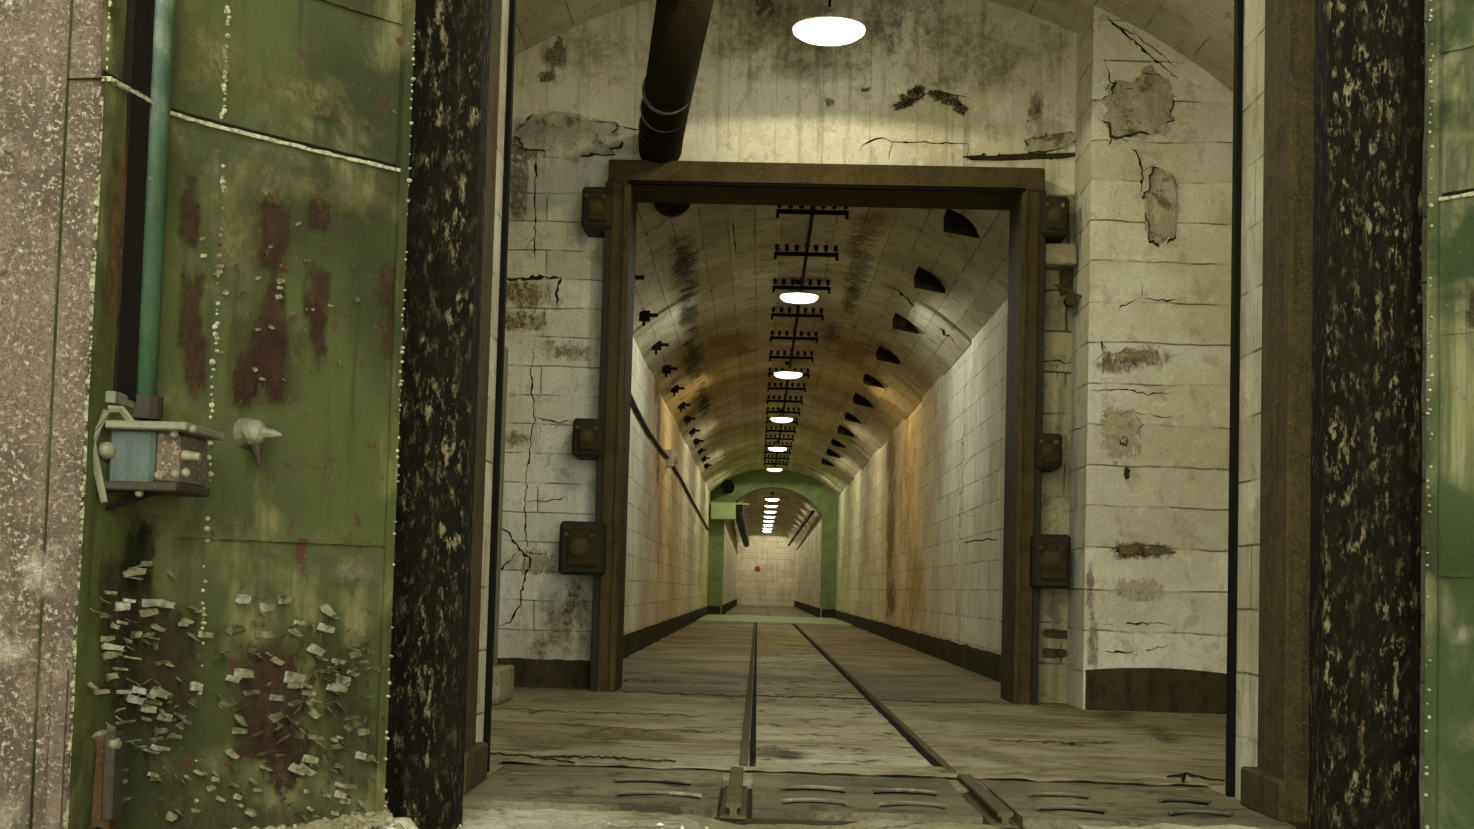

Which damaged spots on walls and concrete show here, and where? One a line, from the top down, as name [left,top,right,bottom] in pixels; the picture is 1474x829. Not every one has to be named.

corrosion [178,272,208,393]
corrosion [253,194,289,400]
corrosion [304,262,330,358]
peeling [407,5,416,215]
crack [507,125,562,309]
spalling [509,111,624,218]
spalling [893,85,968,116]
spalling [1101,65,1175,144]
crack [1100,16,1178,227]
spalling [1143,167,1180,247]
peeling [63,97,393,829]
crack [499,339,571,626]